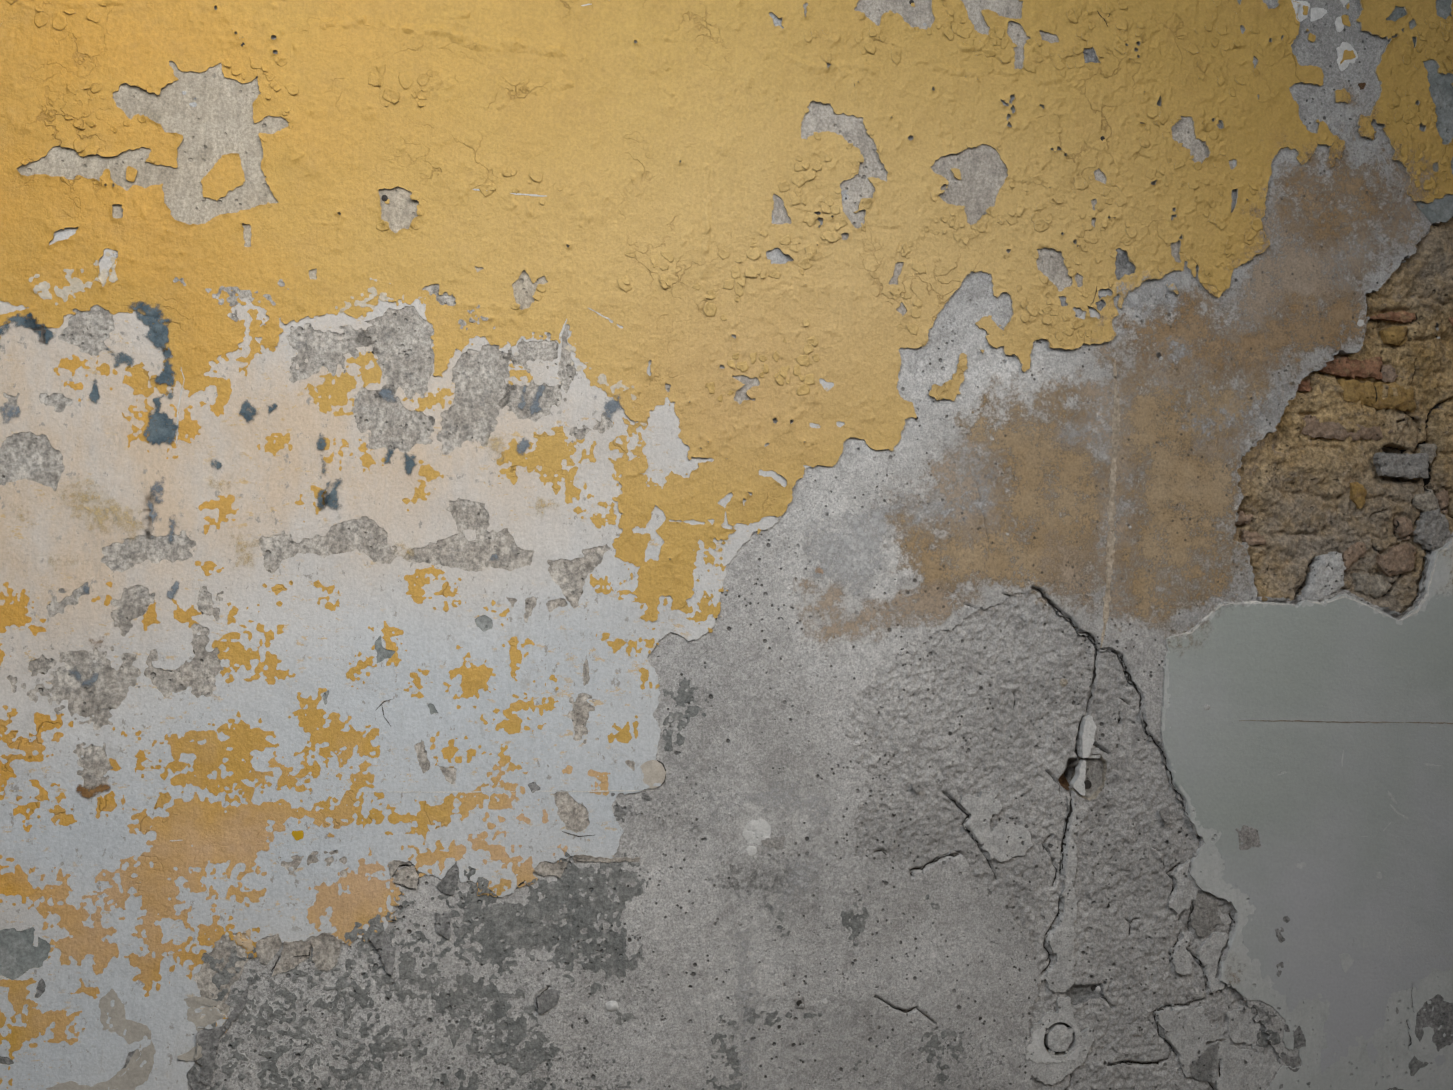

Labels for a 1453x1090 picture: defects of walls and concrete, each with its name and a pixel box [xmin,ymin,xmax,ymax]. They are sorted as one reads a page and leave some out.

peeling [17,61,293,247]
peeling [801,101,887,240]
peeling [931,139,1008,230]
peeling [29,252,118,356]
flaking render [1233,195,1453,613]
peeling [258,498,610,623]
peeling [7,530,227,791]
crack [877,795,996,879]
crack [964,586,1188,973]
peeling [0,927,51,998]
peeling [177,850,659,1090]
crack [1107,847,1235,1066]